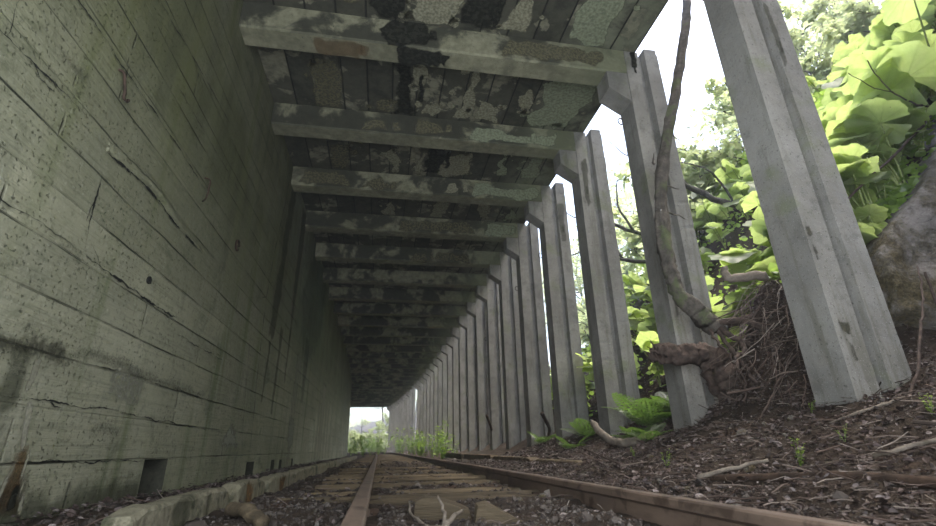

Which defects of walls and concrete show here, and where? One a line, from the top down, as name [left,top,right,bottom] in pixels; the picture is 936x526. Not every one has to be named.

peeling [398,0,464,28]
crack [0,181,219,359]